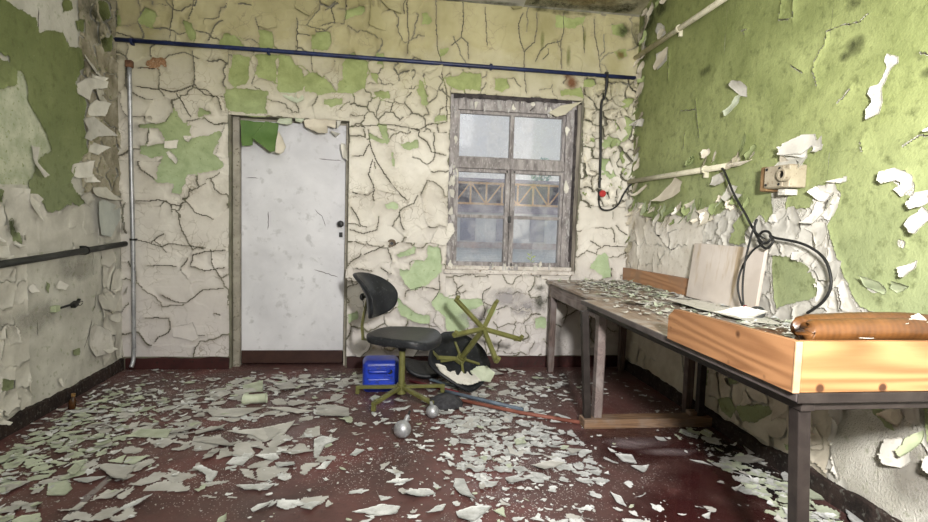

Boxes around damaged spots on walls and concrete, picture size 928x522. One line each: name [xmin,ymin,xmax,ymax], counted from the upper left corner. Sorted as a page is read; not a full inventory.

crack [140,55,218,115]
crack [518,14,600,91]
crack [349,2,487,282]
peeling [0,0,928,365]
crack [143,234,225,341]
peeling [0,264,69,425]
peeling [605,320,789,454]
peeling [810,410,847,490]
peeling [871,408,928,474]